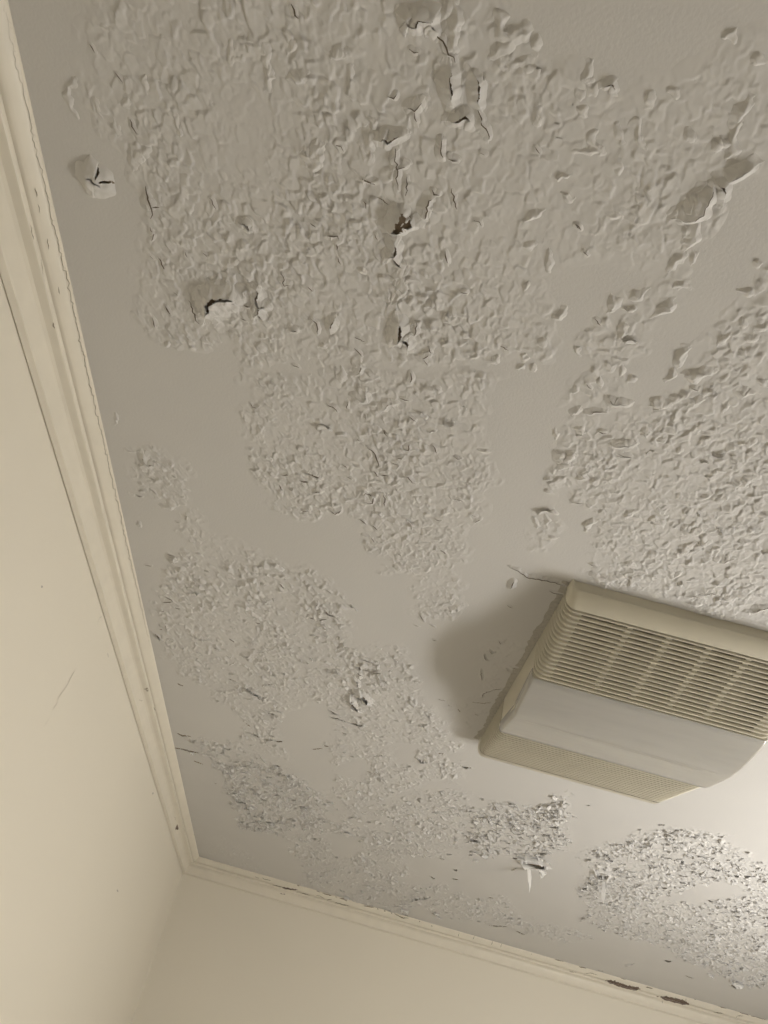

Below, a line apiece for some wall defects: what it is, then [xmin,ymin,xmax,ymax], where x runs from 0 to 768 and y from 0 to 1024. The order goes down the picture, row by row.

peeling [394,0,443,41]
peeling [432,56,488,132]
peeling [373,125,412,151]
peeling [72,154,116,199]
peeling [710,153,764,208]
peeling [375,201,430,271]
peeling [193,277,273,328]
peeling [385,312,417,356]
peeling [603,394,635,408]
peeling [327,656,376,727]
peeling [509,855,551,891]
peeling [605,980,640,991]